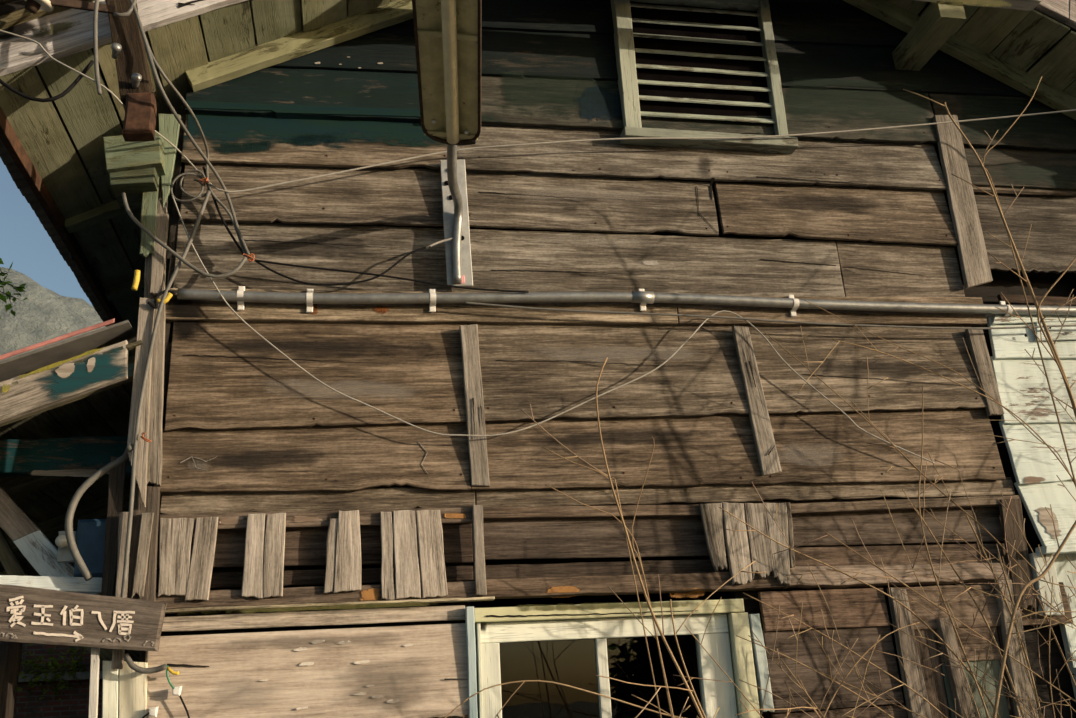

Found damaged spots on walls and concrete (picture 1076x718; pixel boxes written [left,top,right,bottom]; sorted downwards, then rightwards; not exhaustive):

peeling [38,348,127,399]
peeling [1025,476,1046,484]
peeling [1036,507,1062,539]